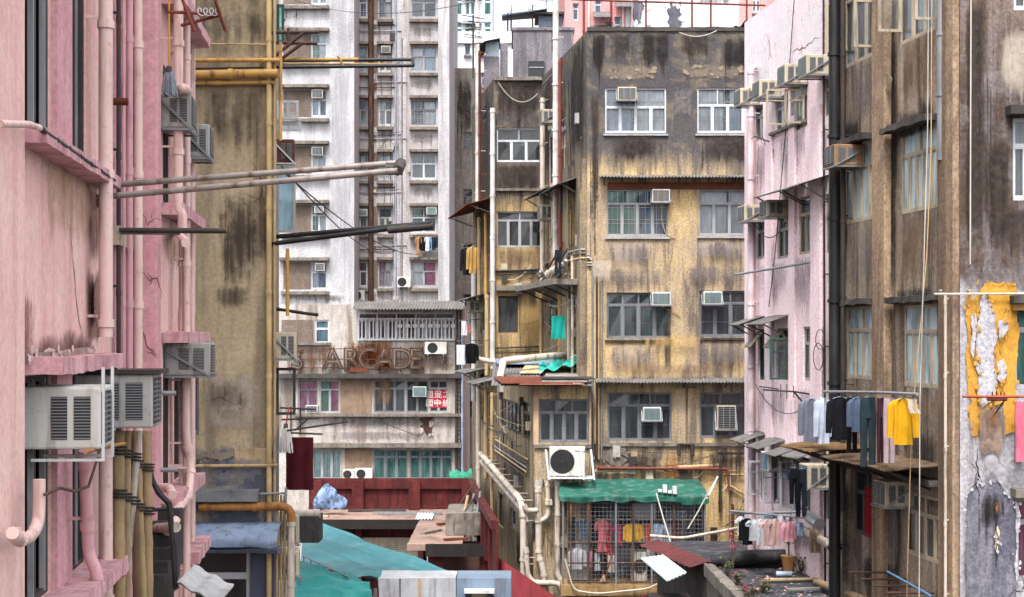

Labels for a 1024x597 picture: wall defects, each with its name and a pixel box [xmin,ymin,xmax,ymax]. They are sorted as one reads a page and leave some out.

peeling [604,64,657,80]
water stain [683,35,708,59]
water stain [571,25,668,215]
water stain [25,276,99,356]
water stain [222,287,243,304]
water stain [225,204,266,273]
water stain [593,243,659,285]
corrosion [352,342,389,369]
peeling [963,279,1020,456]
peeling [964,474,1022,597]